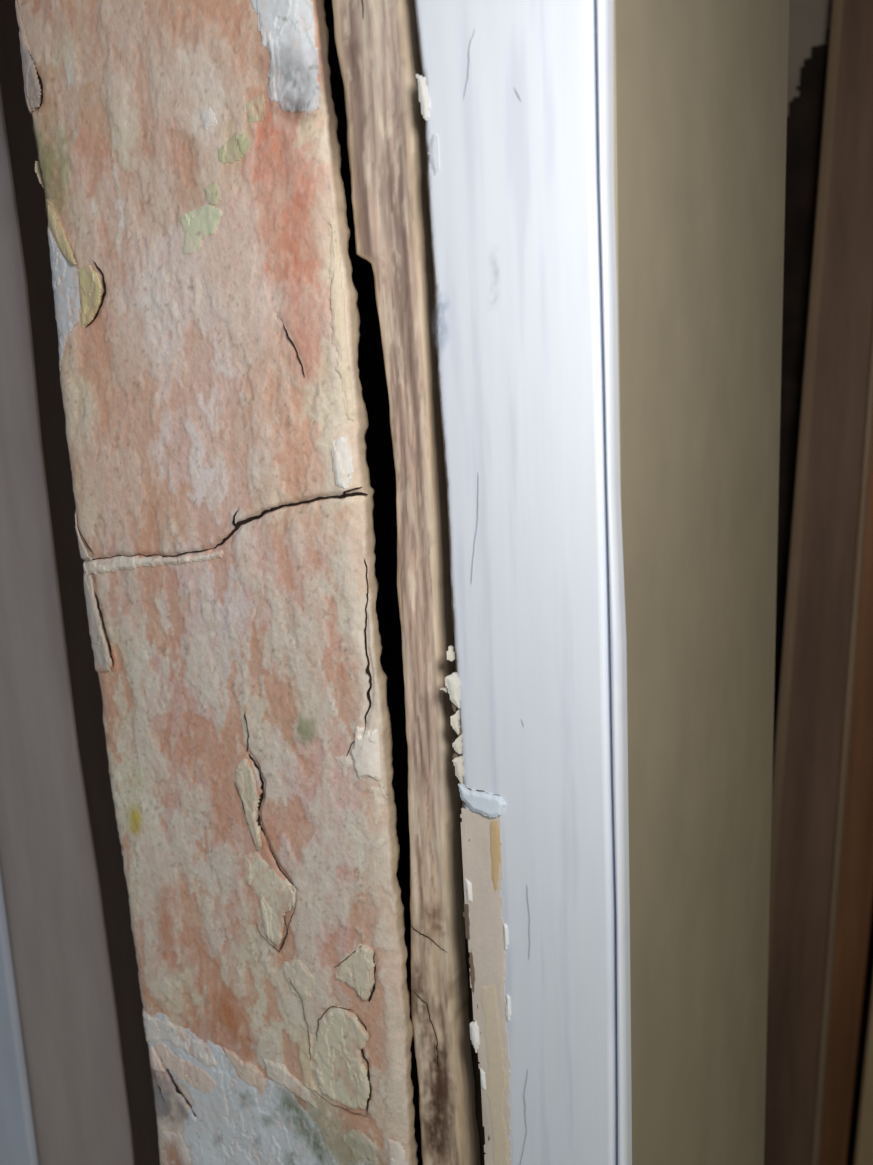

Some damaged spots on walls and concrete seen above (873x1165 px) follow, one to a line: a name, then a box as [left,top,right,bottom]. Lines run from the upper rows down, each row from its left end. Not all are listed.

peeling [15,0,41,114]
peeling [218,0,321,164]
peeling [416,74,430,121]
peeling [428,134,440,175]
peeling [35,161,102,371]
peeling [75,511,223,672]
crack [77,0,446,1165]
peeling [235,758,297,946]
flaking render [335,726,388,824]
peeling [460,808,512,1165]
water stain [152,1074,185,1118]
peeling [143,1006,408,1165]